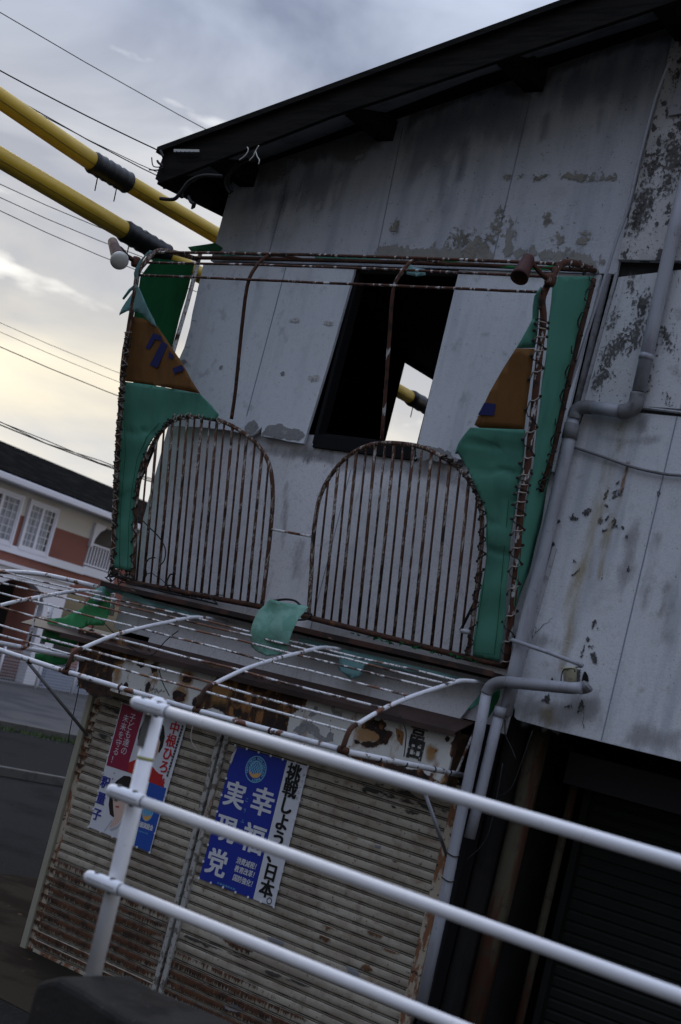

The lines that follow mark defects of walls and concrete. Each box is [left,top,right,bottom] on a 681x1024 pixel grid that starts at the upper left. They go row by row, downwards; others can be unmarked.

water stain [624,115,681,241]
peeling [374,205,605,268]
peeling [591,273,652,392]
peeling [655,326,677,353]
peeling [557,481,628,539]
peeling [577,620,598,682]
corrosion [75,627,158,775]
corrosion [172,665,307,732]
corrosion [346,717,461,785]
corrosion [27,858,105,968]